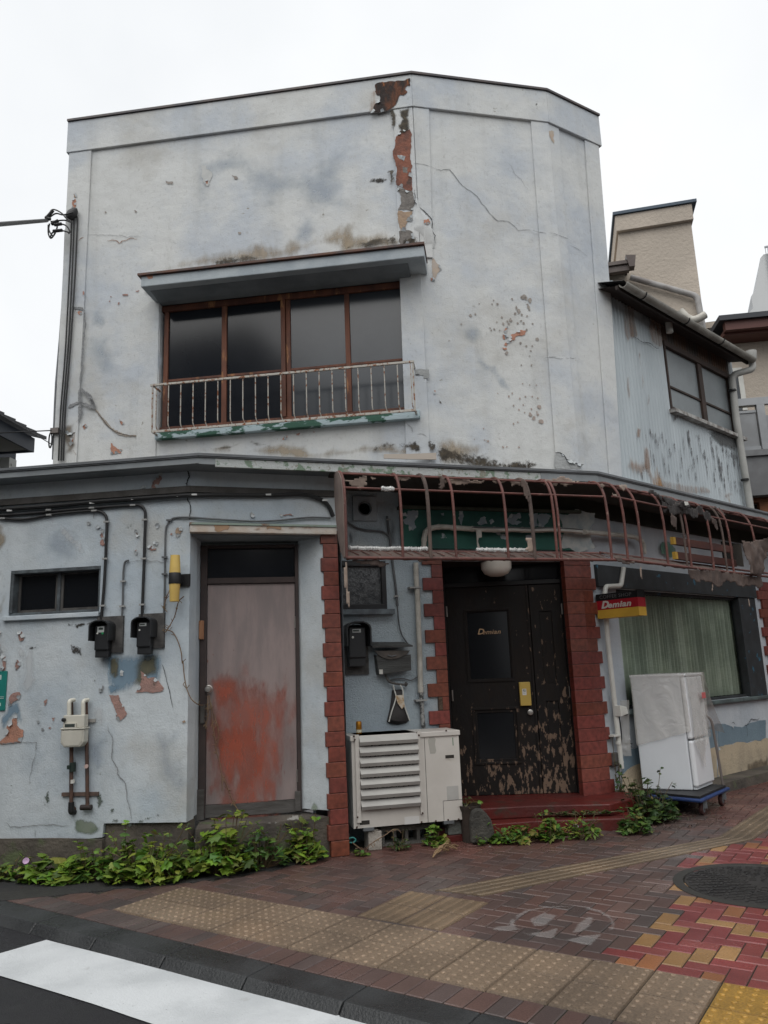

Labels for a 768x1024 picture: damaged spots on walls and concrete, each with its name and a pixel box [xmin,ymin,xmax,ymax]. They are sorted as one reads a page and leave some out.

spalling [371,78,410,113]
spalling [393,129,430,244]
damp [329,230,417,249]
spalling [461,294,539,366]
crack [68,307,136,437]
damp [374,441,535,468]
peeling [638,430,741,498]
peeling [0,692,23,744]
peeling [94,680,127,721]
peeling [137,671,164,693]
crack [108,731,131,814]